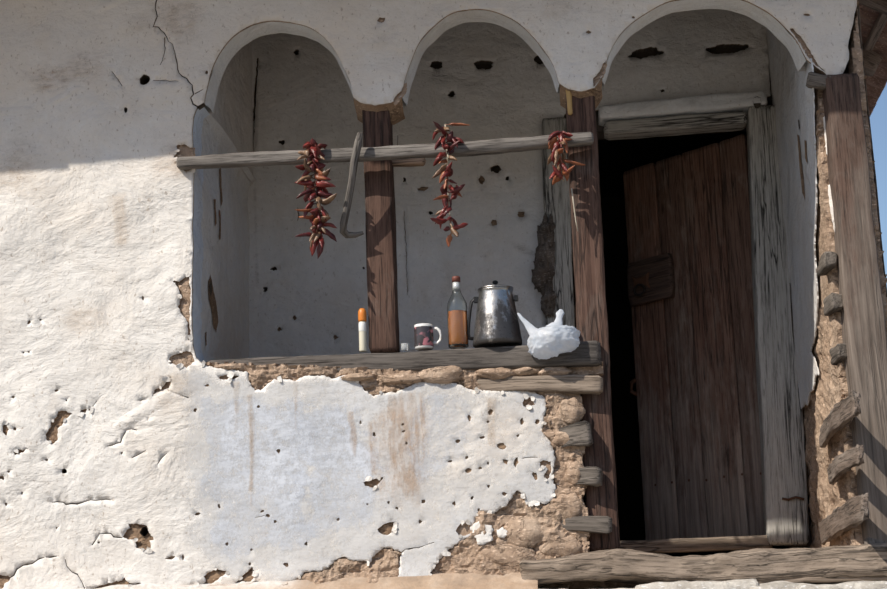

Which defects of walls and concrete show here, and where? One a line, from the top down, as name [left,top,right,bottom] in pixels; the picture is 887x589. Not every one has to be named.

crack [153,2,206,110]
flaking render [827,185,835,234]
spalling [174,273,193,341]
spalling [154,351,206,394]
spalling [46,400,87,444]
spalling [516,393,535,437]
spalling [364,476,383,491]
spalling [124,524,154,553]
spalling [378,521,398,535]
flaking render [456,496,507,545]
crack [10,556,85,588]
spalling [194,563,258,587]